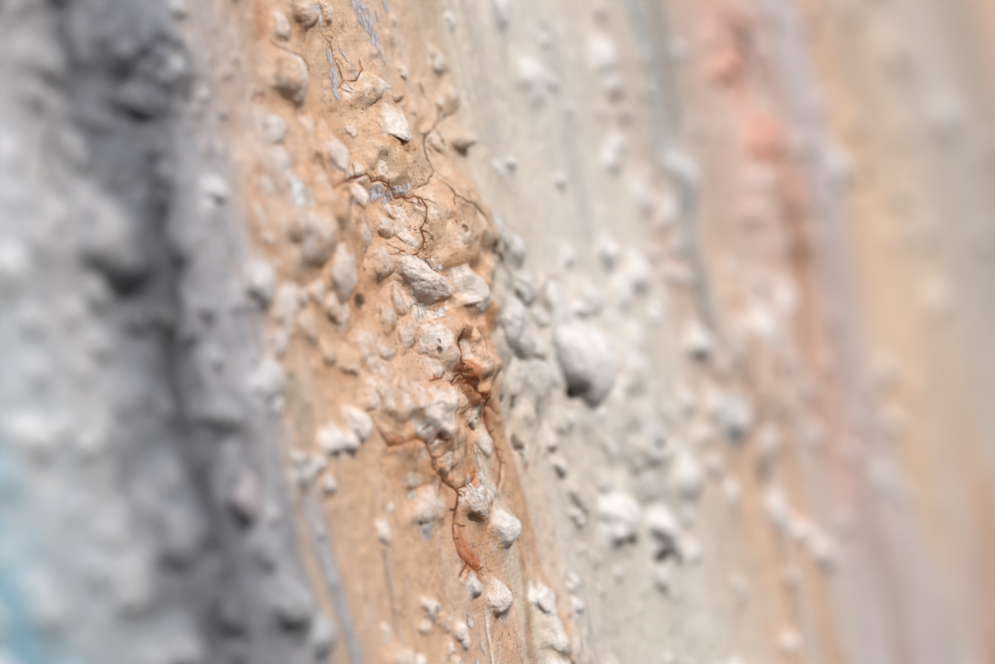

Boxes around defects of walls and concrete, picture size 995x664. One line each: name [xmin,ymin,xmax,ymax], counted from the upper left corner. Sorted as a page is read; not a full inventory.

crack [313,82,557,310]
crack [371,328,506,577]